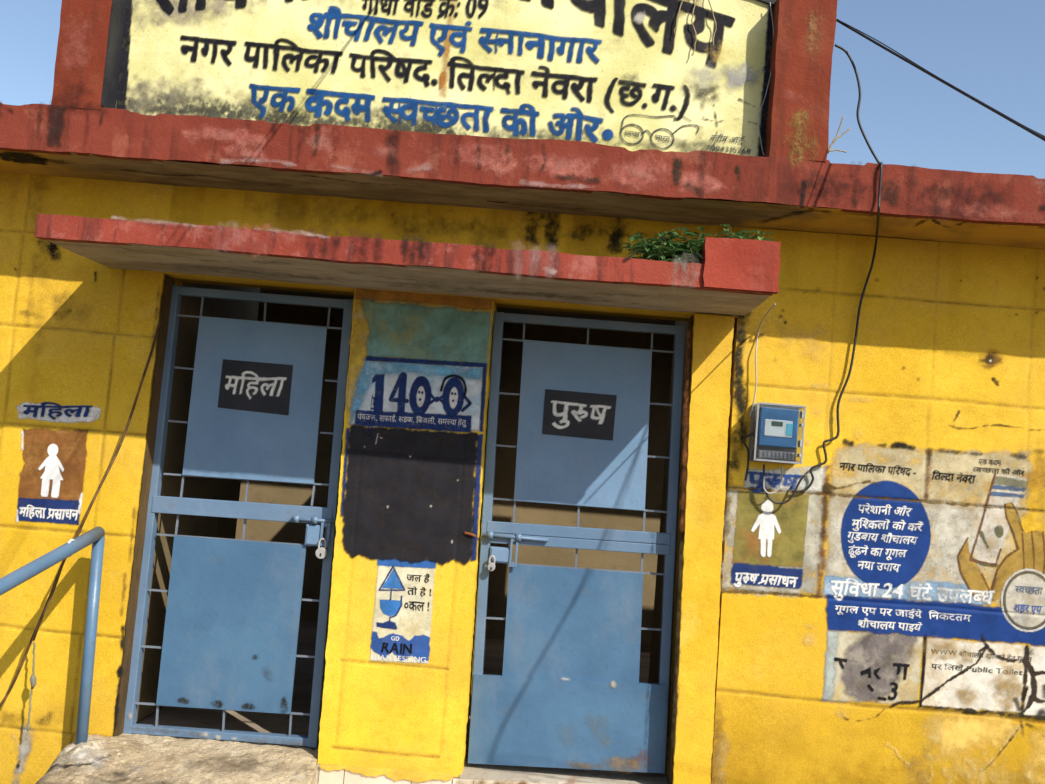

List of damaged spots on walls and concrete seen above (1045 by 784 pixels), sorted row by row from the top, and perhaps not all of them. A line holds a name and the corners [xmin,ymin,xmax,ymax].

damp [47,106,65,146]
damp [126,82,456,164]
damp [0,152,64,165]
damp [38,240,59,259]
damp [724,312,751,523]
crack [954,410,1040,430]
crack [844,634,1045,771]